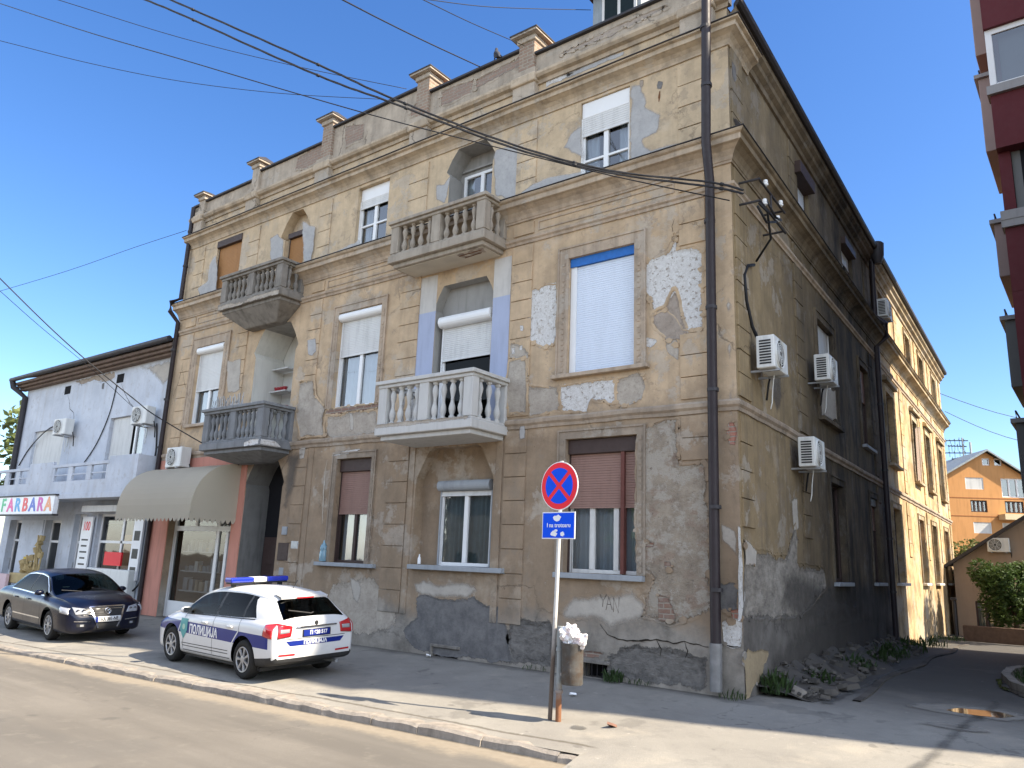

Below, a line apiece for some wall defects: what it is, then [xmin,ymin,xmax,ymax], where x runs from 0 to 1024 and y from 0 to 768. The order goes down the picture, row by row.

peeling [511,282,557,354]
peeling [646,231,706,359]
peeling [520,372,648,439]
spalling [633,417,828,699]
peeling [327,577,396,635]
crack [601,626,741,658]